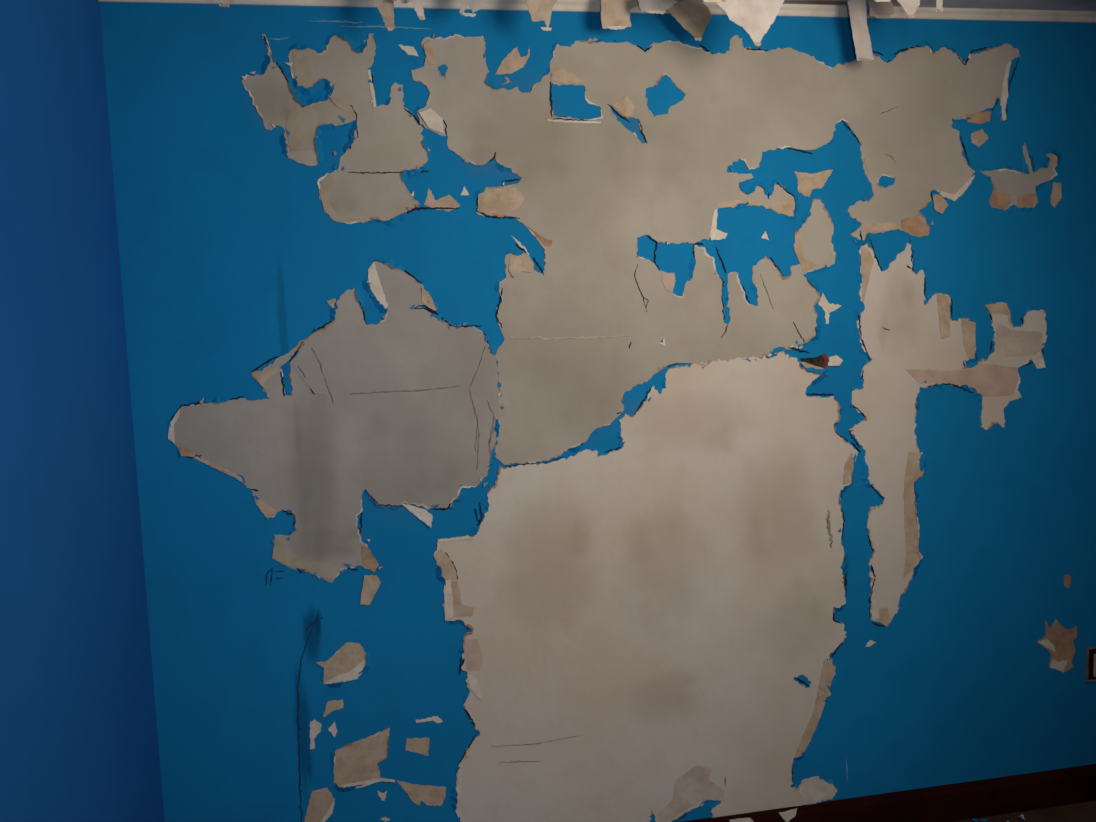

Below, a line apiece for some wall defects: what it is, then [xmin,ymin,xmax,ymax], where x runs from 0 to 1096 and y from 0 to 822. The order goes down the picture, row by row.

peeling [980,143,1062,213]
peeling [167,0,1049,627]
peeling [434,347,861,822]
peeling [316,642,371,688]
peeling [1037,619,1077,673]
peeling [309,700,344,750]
peeling [330,728,446,806]
peeling [305,787,335,822]